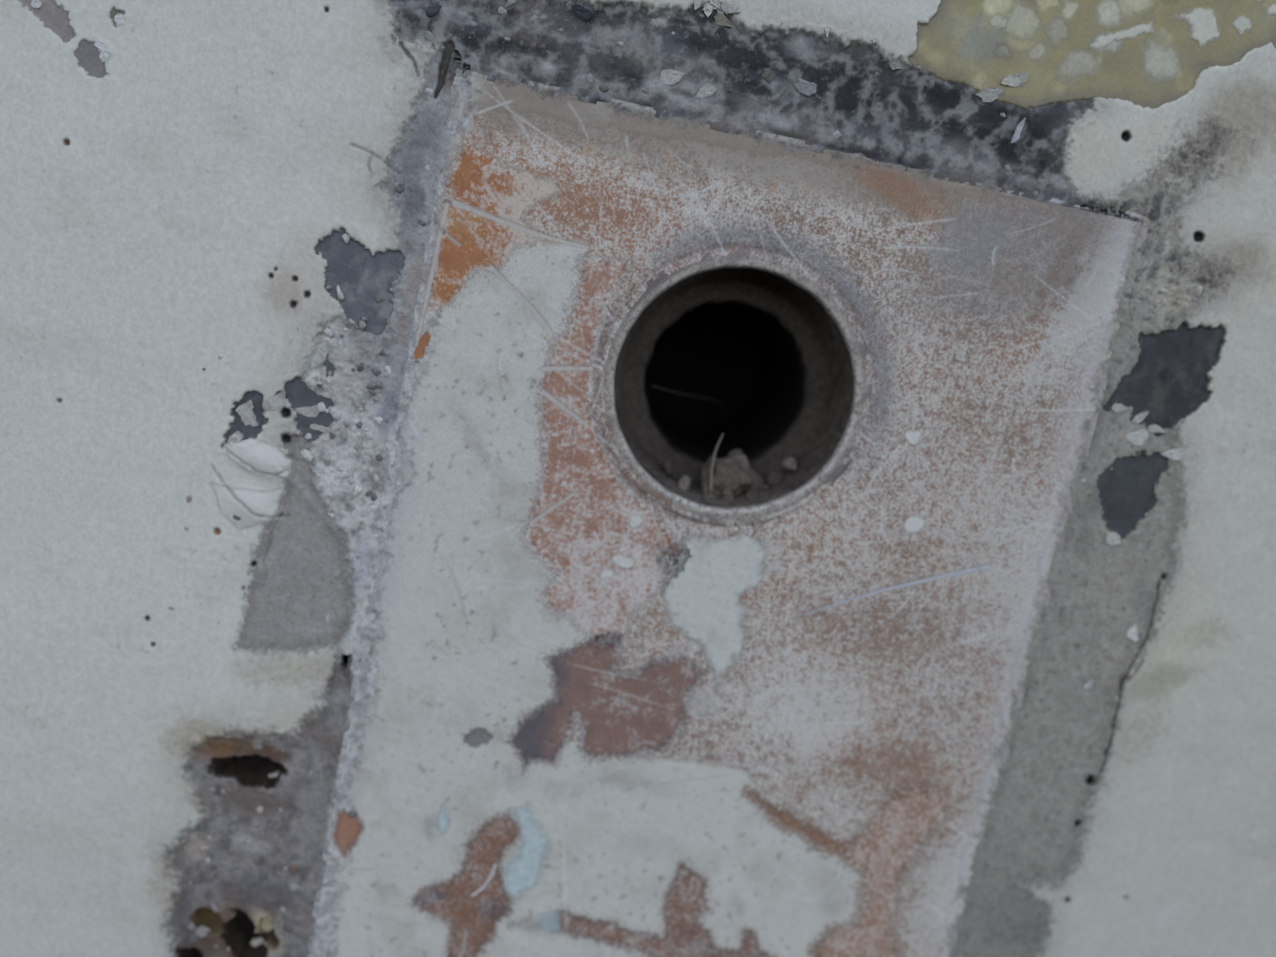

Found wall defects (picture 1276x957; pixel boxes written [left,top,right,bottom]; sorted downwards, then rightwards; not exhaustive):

peeling [19,0,111,78]
spalling [167,52,466,957]
spalling [390,0,1276,957]
crack [1096,583,1159,780]